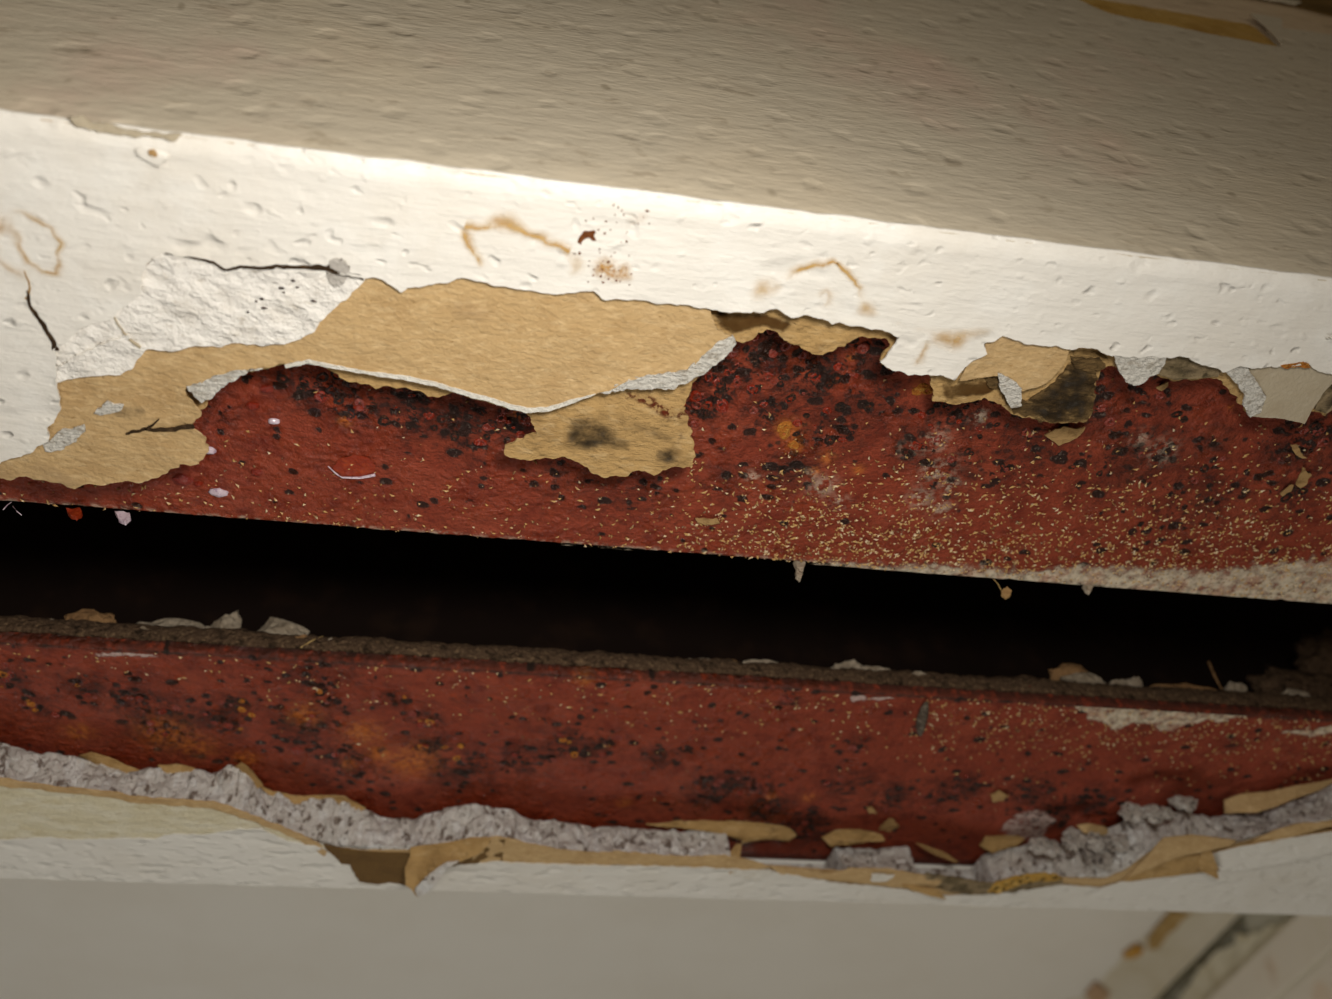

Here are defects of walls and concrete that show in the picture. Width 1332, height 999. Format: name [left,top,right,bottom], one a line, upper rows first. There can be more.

crack [24,271,60,351]
crack [165,253,364,288]
water stain [463,222,570,261]
water stain [797,260,859,288]
rust [276,372,533,446]
peeling [0,253,897,489]
rust [684,329,884,449]
rust [901,383,1001,464]
peeling [929,336,1332,424]
rust [1280,485,1308,503]
peeling [0,777,327,856]
peeling [1212,829,1332,871]